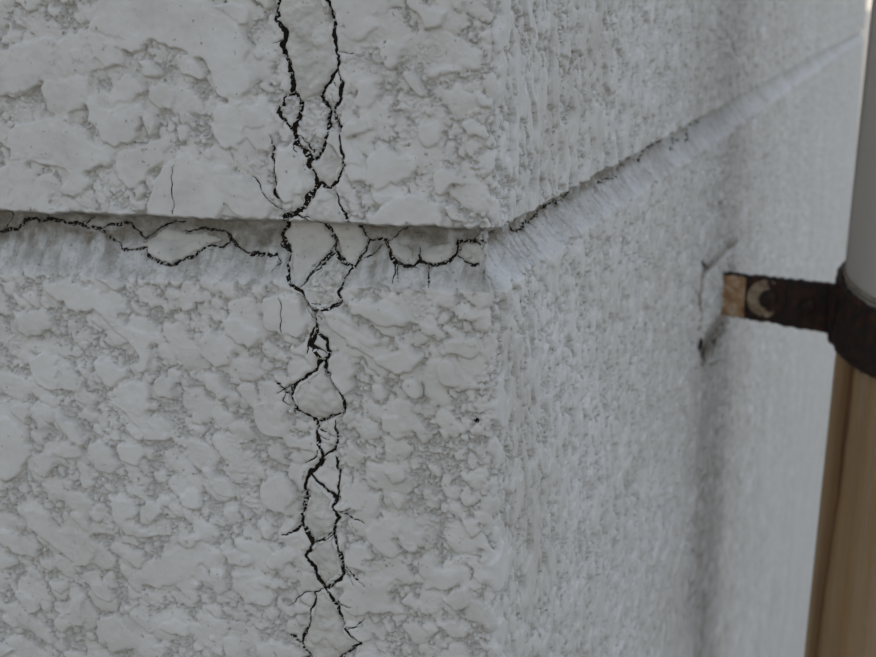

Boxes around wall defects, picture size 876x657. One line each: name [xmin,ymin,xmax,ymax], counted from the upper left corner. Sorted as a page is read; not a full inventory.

crack [0,0,570,657]
crack [596,121,698,185]